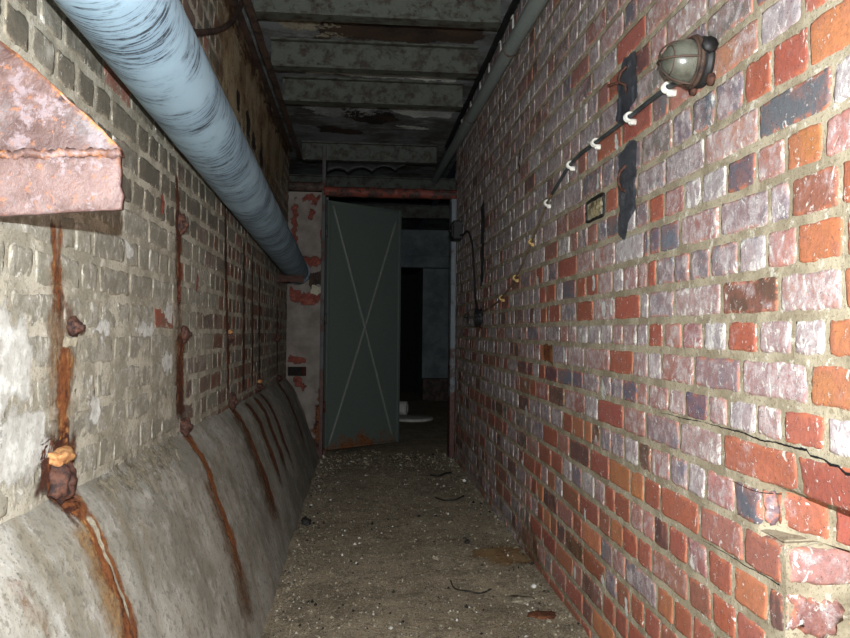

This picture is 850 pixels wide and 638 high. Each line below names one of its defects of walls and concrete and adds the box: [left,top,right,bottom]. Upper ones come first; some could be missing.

peeling [291,193,321,245]
rust [175,175,186,417]
rust [243,244,261,387]
peeling [289,256,321,306]
rust [35,224,138,638]
rust [231,410,276,519]
rust [245,394,291,482]
crack [659,412,850,476]
rust [183,435,251,615]